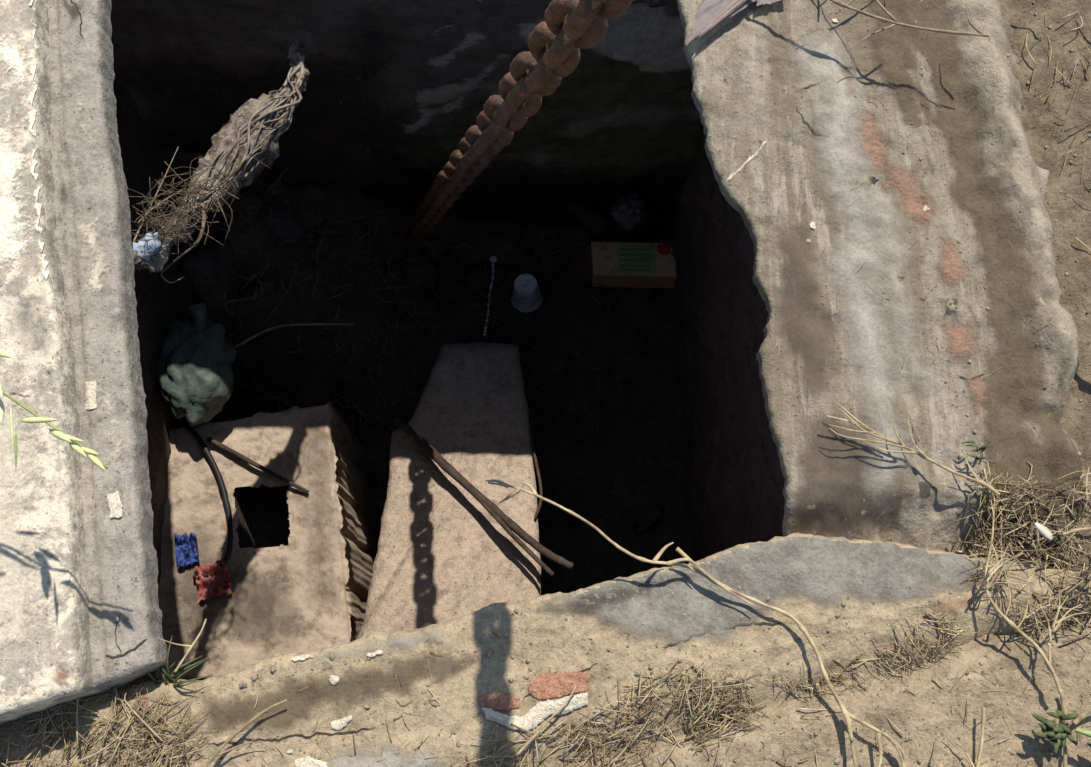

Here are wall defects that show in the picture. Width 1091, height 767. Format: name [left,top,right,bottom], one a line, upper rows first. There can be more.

water stain [136,61,291,155]
water stain [259,35,486,209]
water stain [443,53,704,235]
crack [665,621,783,648]
crack [206,727,376,746]
spalling [478,672,591,731]